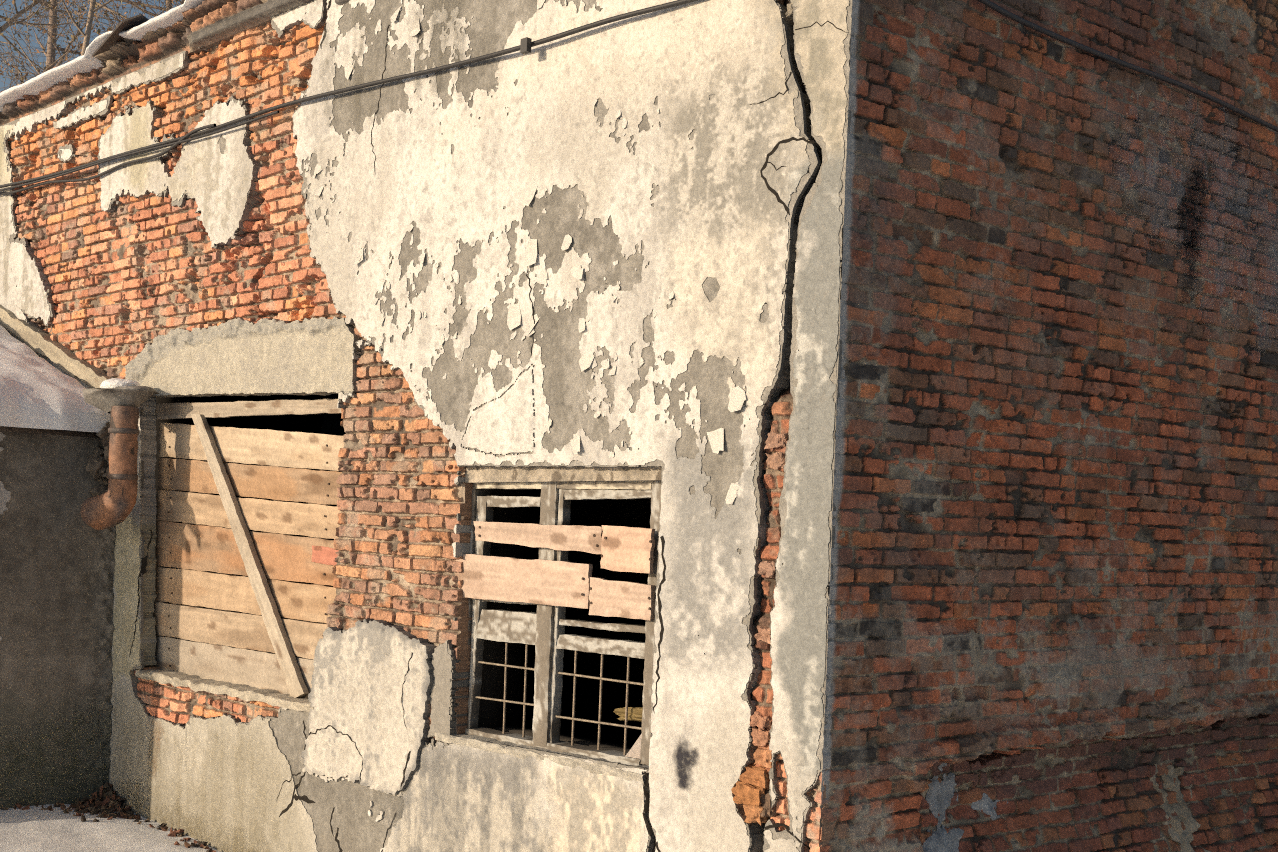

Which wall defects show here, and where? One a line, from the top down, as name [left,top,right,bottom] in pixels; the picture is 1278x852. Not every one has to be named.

crack [778,0,848,33]
crack [750,72,791,105]
crack [760,137,816,215]
spalling [0,0,854,852]
crack [653,536,666,711]
crack [731,387,810,851]
crack [277,720,362,852]
crack [381,654,412,852]
crack [642,768,661,852]
spalling [917,714,1278,852]